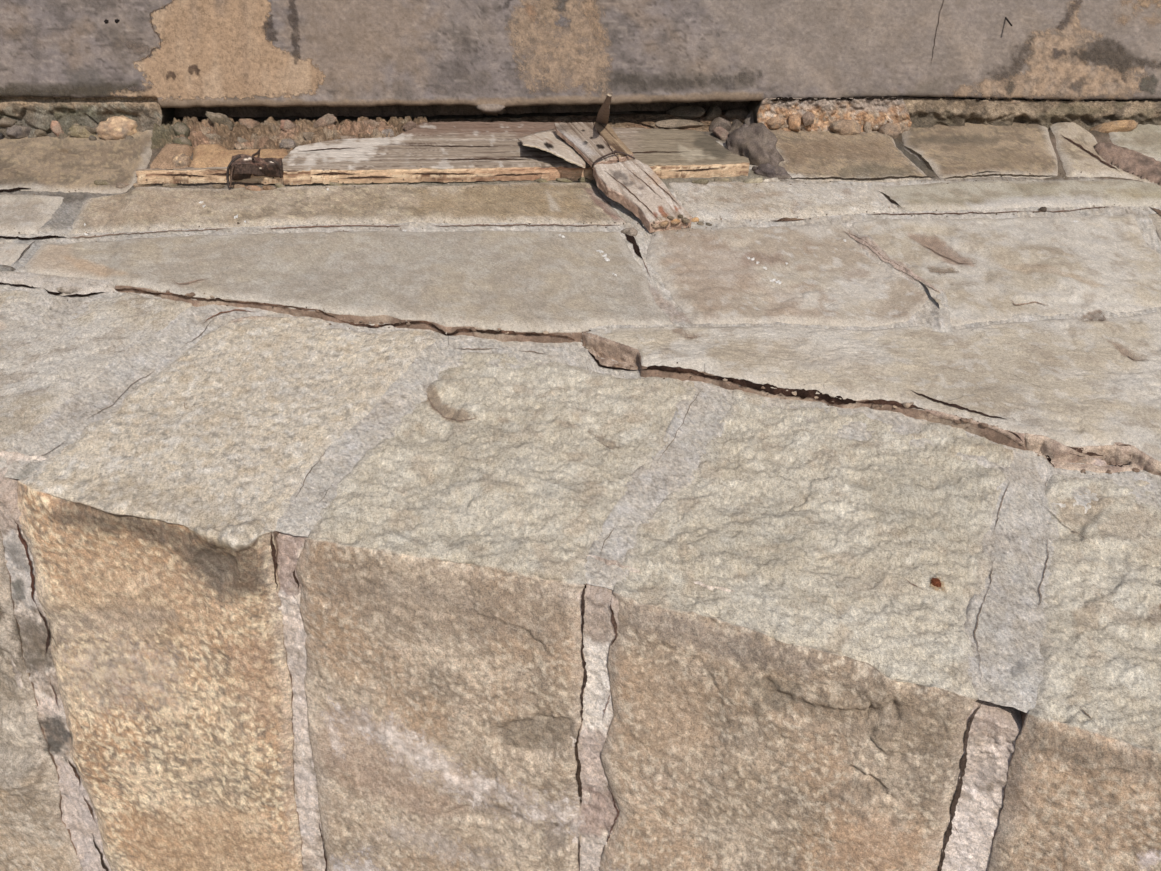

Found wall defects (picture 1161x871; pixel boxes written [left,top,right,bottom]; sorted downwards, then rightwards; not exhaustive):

peeling [110,0,326,102]
crack [0,185,31,193]
crack [0,228,226,288]
crack [115,279,575,354]
crack [643,365,1015,462]